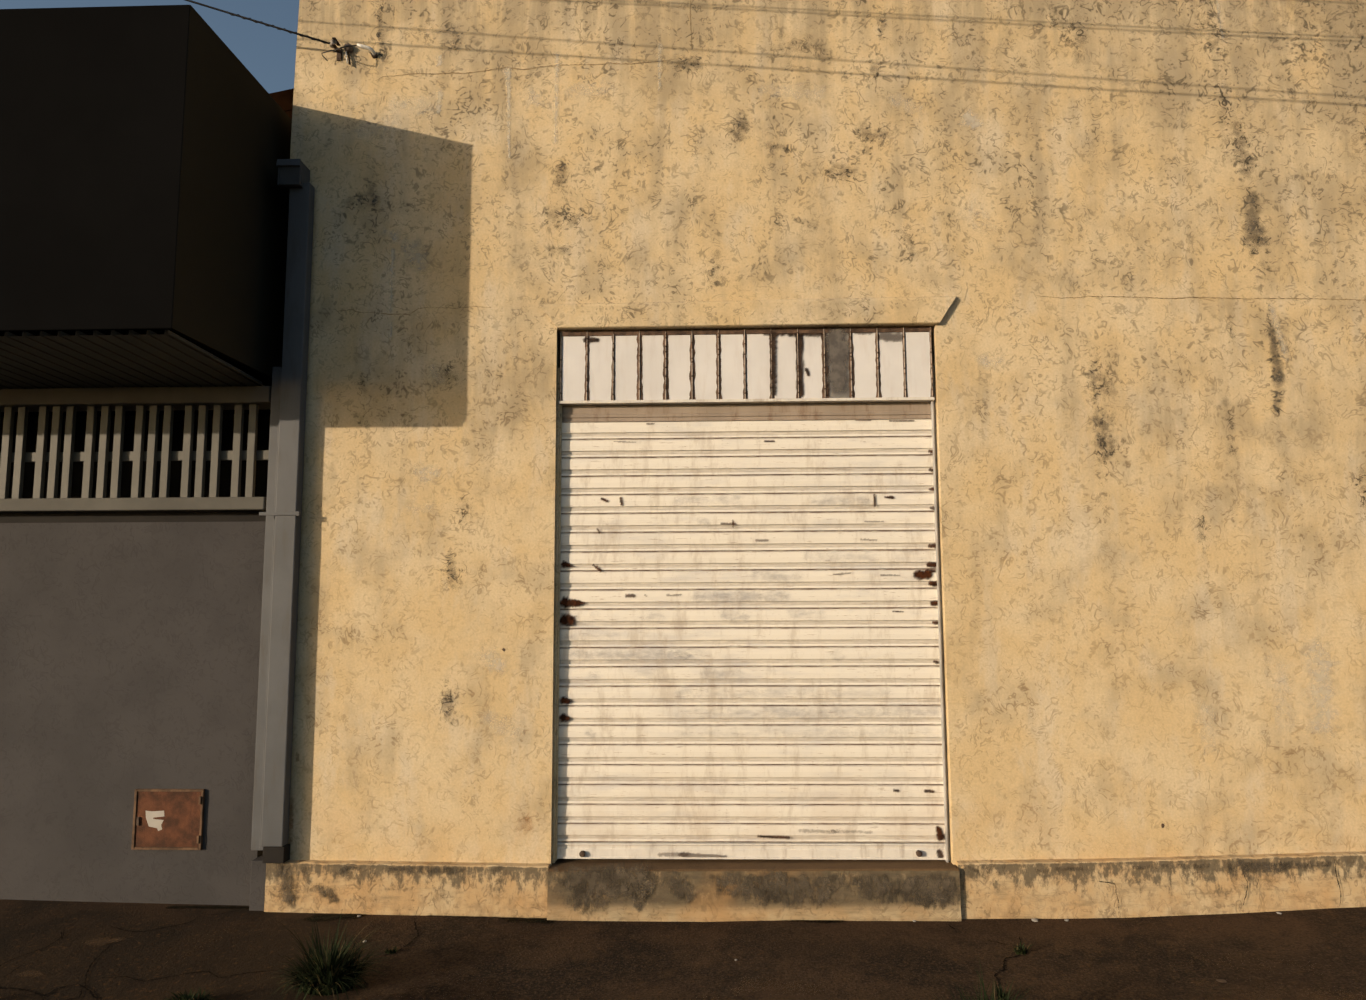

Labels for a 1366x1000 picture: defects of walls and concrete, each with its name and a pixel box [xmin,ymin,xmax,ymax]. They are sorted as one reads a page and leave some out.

damp [1243,192,1267,253]
damp [1268,323,1283,413]
rust [913,543,938,625]
rust [560,597,585,626]
rust [559,696,572,722]
damp [547,864,695,911]
damp [709,871,834,906]
damp [854,875,960,908]
damp [1227,860,1329,873]
crack [0,911,271,1000]